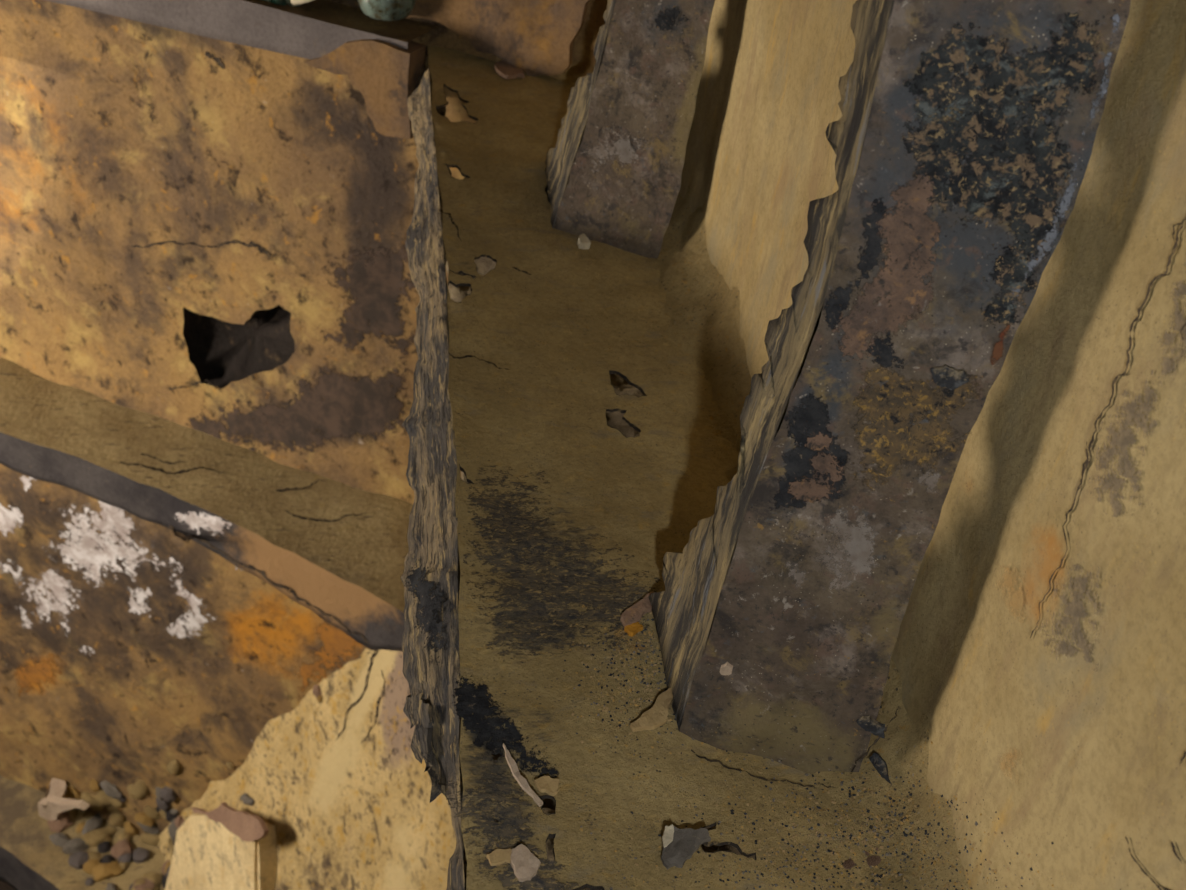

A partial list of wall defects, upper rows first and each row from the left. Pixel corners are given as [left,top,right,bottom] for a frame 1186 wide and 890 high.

spalling [183,305,295,389]
crack [1030,217,1186,639]
water stain [175,511,232,536]
water stain [0,500,217,639]
crack [1125,837,1170,890]